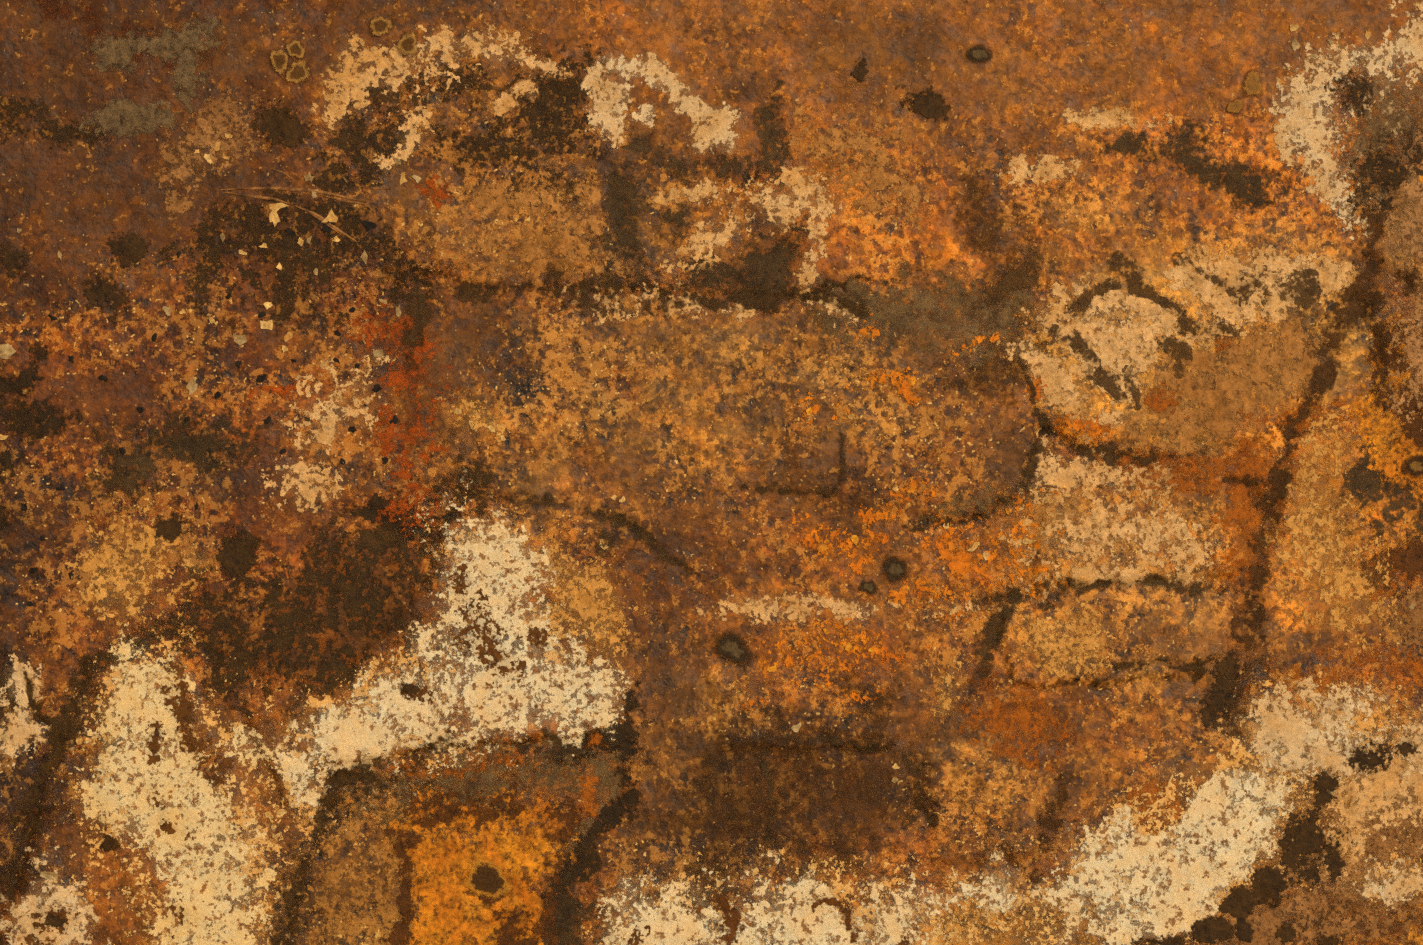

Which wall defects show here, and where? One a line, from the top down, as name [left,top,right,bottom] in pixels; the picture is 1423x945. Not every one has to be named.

leakage [329,37,1043,390]
leakage [1046,250,1240,411]
leakage [1172,252,1323,310]
crack [0,662,94,901]
leakage [79,610,195,680]
rust [145,654,235,786]
leakage [361,489,460,541]
crack [270,728,589,945]
rust [379,749,600,945]
rust [437,555,550,694]
rust [788,477,1065,626]
rust [1127,738,1418,945]